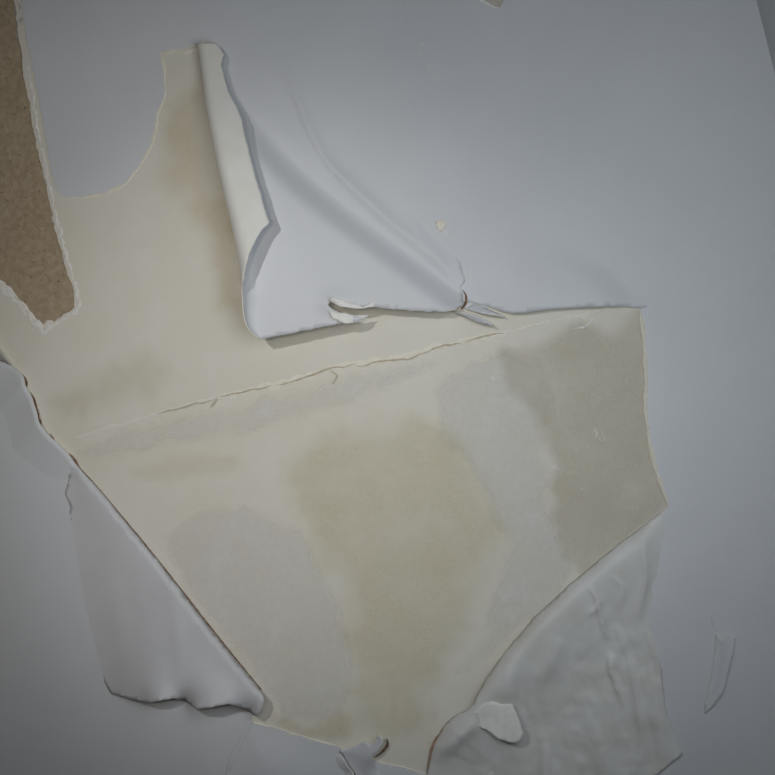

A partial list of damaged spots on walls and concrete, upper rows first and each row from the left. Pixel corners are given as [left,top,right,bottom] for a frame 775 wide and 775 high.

peeling [197,41,465,339]
peeling [467,217,647,313]
peeling [0,361,77,479]
peeling [65,465,264,717]
peeling [176,509,345,714]
crack [73,310,600,440]
peeling [321,380,363,402]
peeling [442,354,566,628]
peeling [426,507,682,775]
peeling [638,310,668,505]